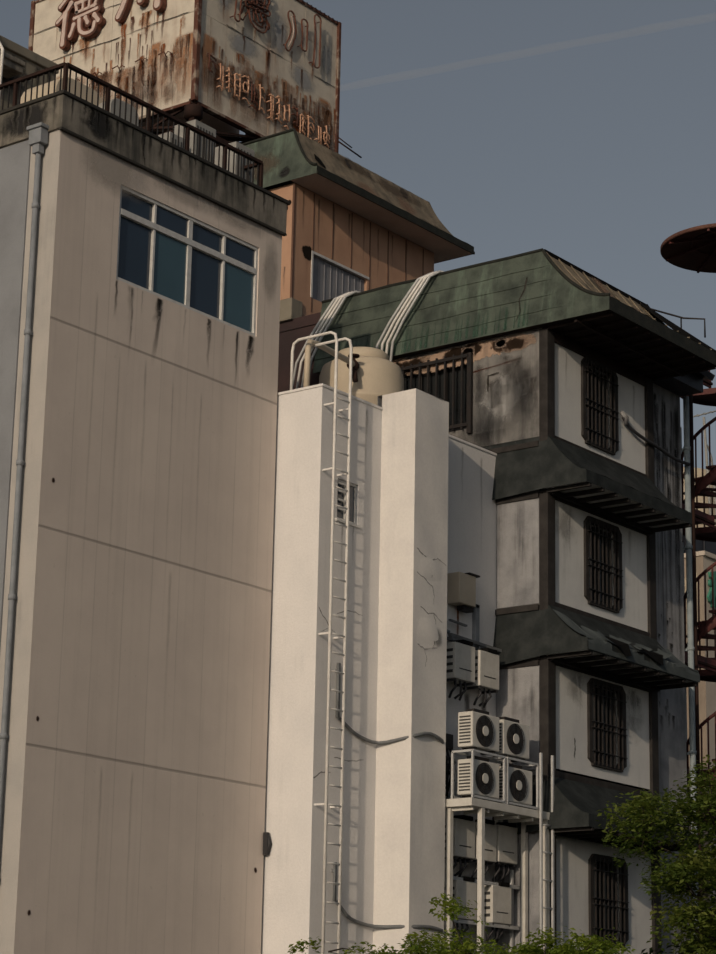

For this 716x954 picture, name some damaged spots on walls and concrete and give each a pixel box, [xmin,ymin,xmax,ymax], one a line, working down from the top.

spalling [392,333,536,374]